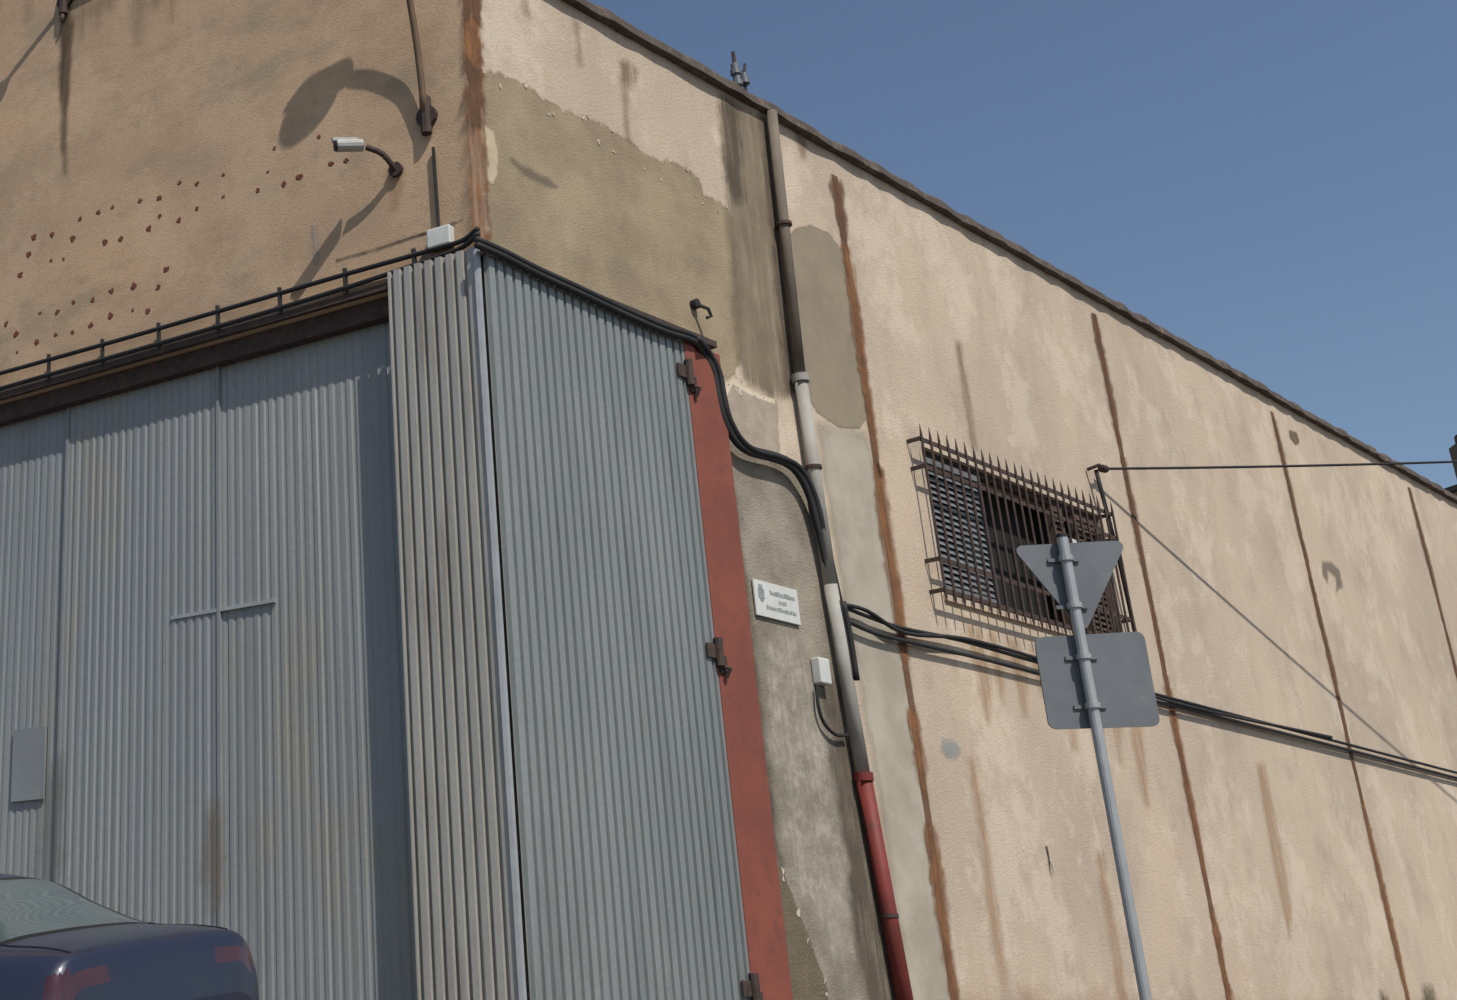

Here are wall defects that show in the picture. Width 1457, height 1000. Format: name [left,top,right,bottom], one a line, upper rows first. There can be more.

water stain [60,7,72,147]
corrosion [463,0,490,241]
water stain [722,98,795,396]
spalling [481,71,951,1000]
corrosion [829,179,909,661]
corrosion [908,709,927,796]
corrosion [1092,314,1232,1000]
corrosion [925,824,959,1000]